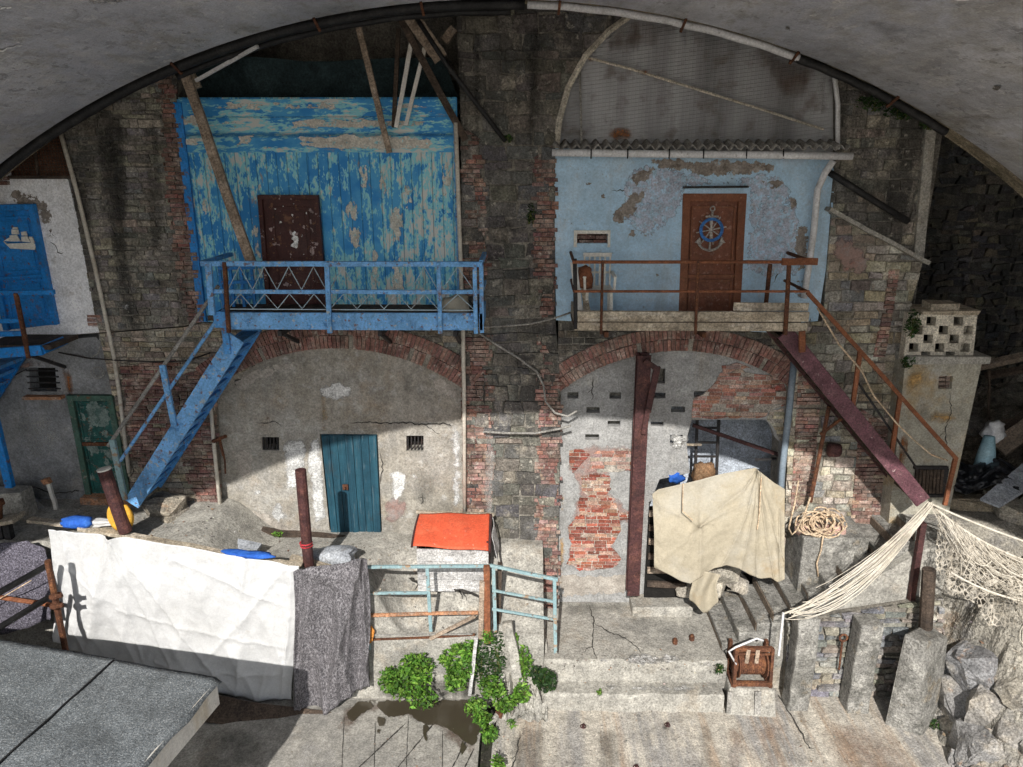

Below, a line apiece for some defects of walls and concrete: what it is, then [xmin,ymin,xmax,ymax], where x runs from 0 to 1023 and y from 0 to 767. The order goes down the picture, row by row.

peeling [217,101,432,151]
peeling [0,177,52,236]
peeling [252,206,263,279]
peeling [346,201,361,248]
peeling [359,165,386,193]
peeling [390,186,414,242]
peeling [613,158,809,297]
crack [355,421,451,434]
flaking render [692,362,786,442]
flaking render [559,446,632,597]
crack [584,608,640,661]